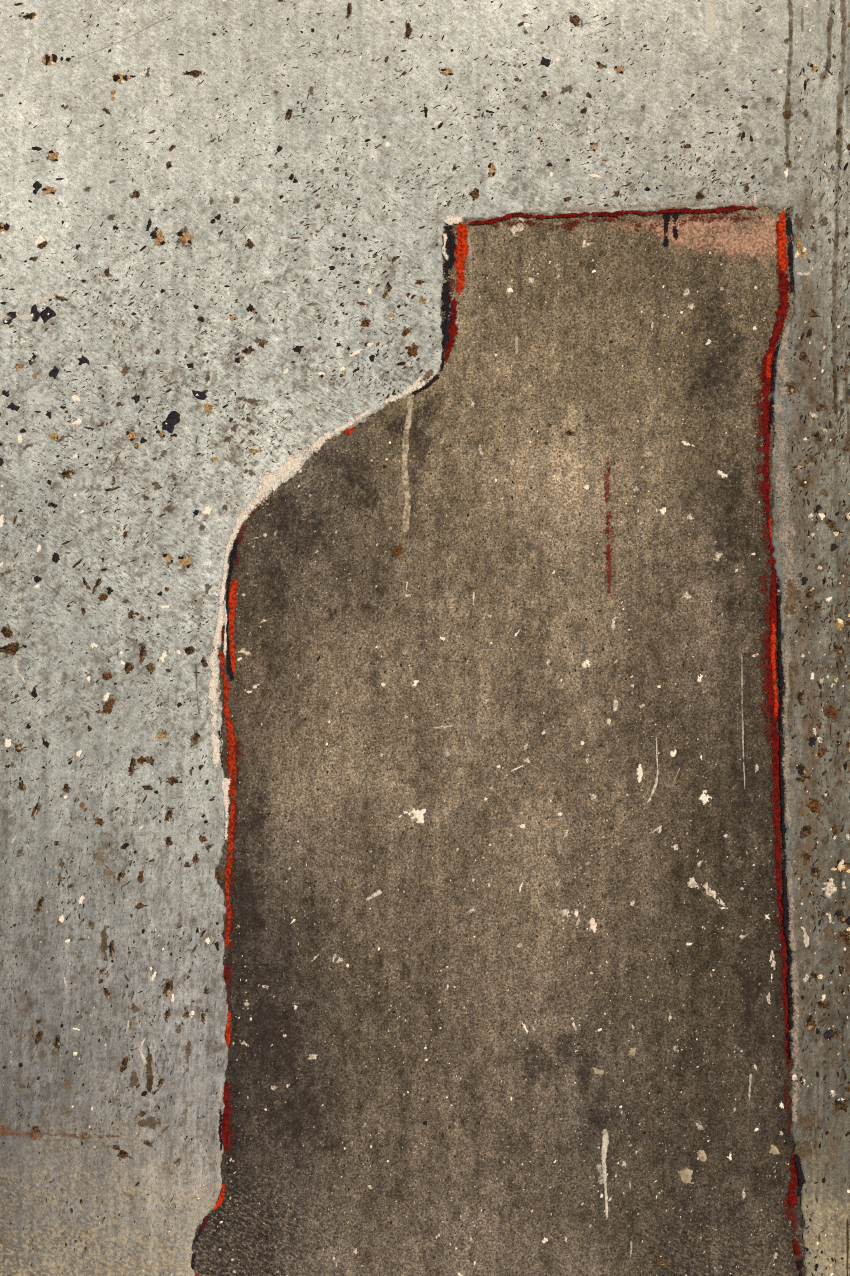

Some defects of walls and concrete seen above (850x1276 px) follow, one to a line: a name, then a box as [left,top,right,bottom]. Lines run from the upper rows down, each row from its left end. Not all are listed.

damp [783,0,804,167]
damp [817,0,847,200]
spalling [146,218,193,249]
damp [832,215,850,448]
peeling [125,411,180,449]
spalling [163,553,191,572]
peeling [184,184,841,1276]
spalling [128,749,182,794]
spalling [164,807,175,847]
spalling [837,859,850,873]
spalling [836,909,850,947]
spalling [162,979,206,1024]